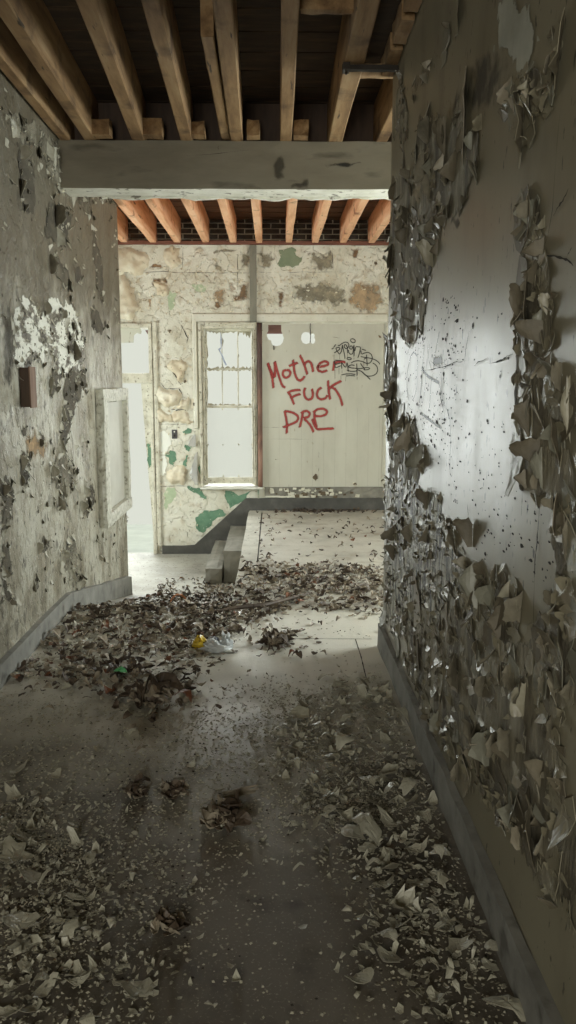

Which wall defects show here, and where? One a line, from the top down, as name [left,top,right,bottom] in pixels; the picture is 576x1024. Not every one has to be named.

flaking render [493,0,565,169]
peeling [0,108,129,606]
flaking render [149,430,210,526]
peeling [235,67,576,935]
peeling [0,600,526,1024]